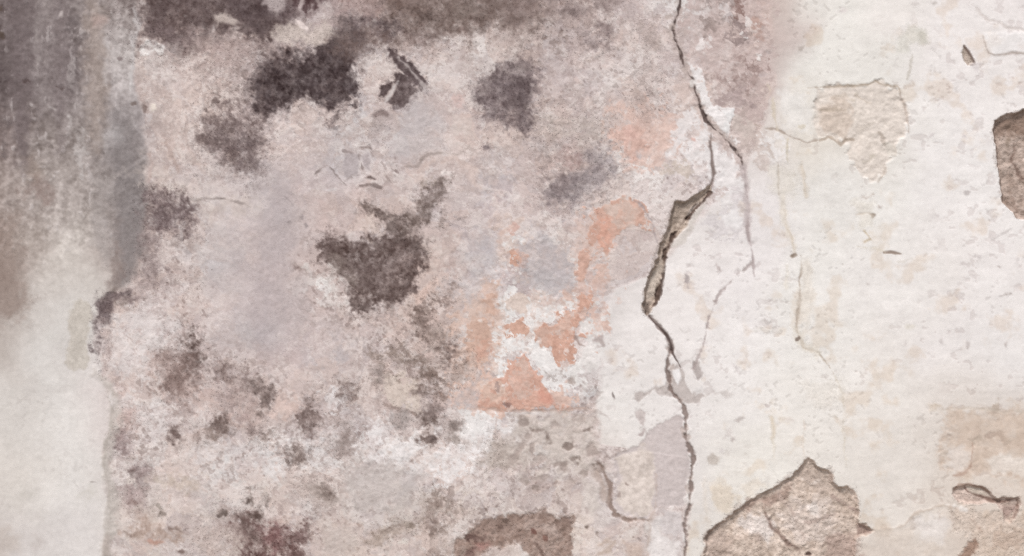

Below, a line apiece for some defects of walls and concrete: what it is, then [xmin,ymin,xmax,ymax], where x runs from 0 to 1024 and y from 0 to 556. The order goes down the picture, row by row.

peeling [112,147,252,231]
flaking render [314,130,471,190]
flaking render [989,107,1024,242]
water stain [0,0,685,556]
peeling [354,0,921,556]
crack [646,0,820,556]
peeling [184,384,353,485]
crack [575,460,650,556]
flaking render [926,396,1024,556]